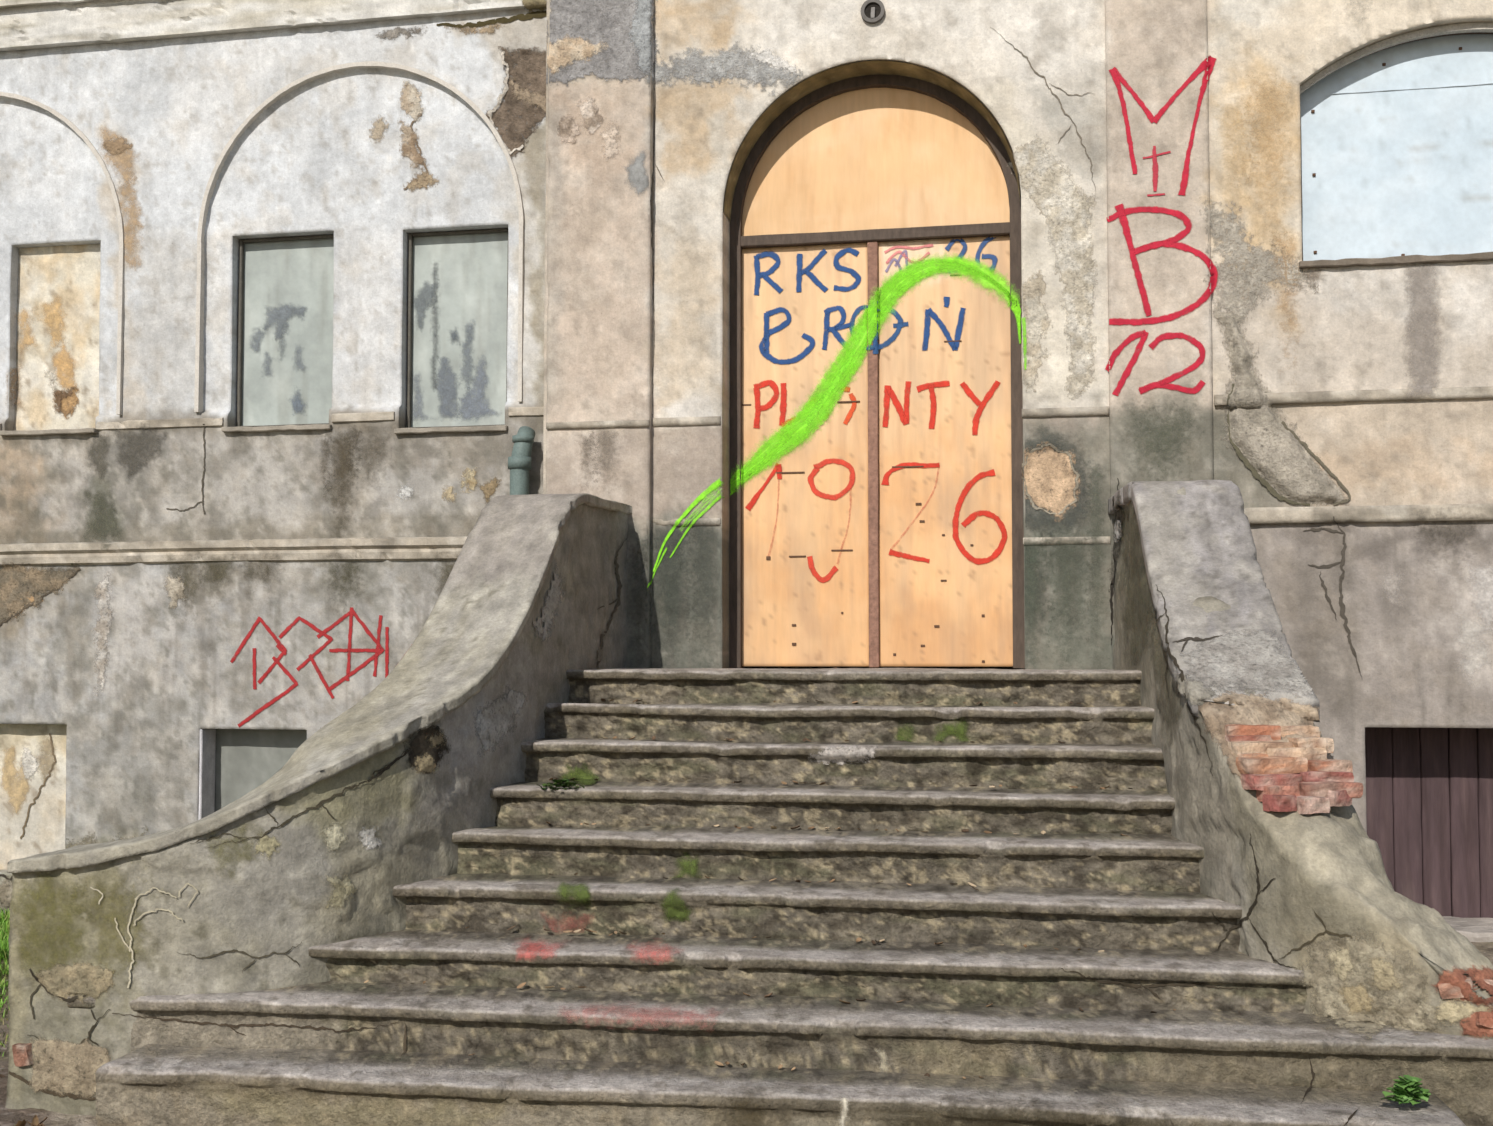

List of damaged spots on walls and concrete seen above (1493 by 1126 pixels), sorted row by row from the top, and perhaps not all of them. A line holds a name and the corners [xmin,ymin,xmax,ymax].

peeling [628,0,658,73]
peeling [369,81,439,191]
spalling [486,37,649,194]
crack [990,27,1096,195]
crack [166,424,205,514]
spalling [1022,434,1088,531]
spalling [0,563,80,625]
crack [1303,516,1361,675]
crack [1155,584,1222,776]
flaking render [1175,629,1363,814]
crack [190,749,407,847]